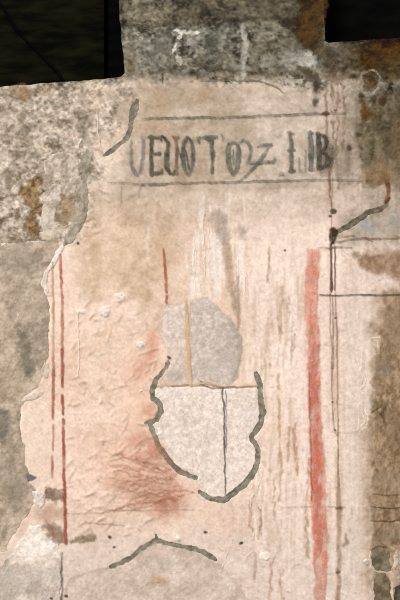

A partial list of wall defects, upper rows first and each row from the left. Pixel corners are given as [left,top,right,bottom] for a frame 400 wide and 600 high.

rust [362,43,400,80]
rust [359,94,379,121]
rust [366,162,391,203]
leakage [214,214,240,326]
rust [329,227,338,292]
leakage [354,251,400,280]
spalling [0,152,80,552]
leakage [370,290,400,553]
spalling [362,547,400,600]